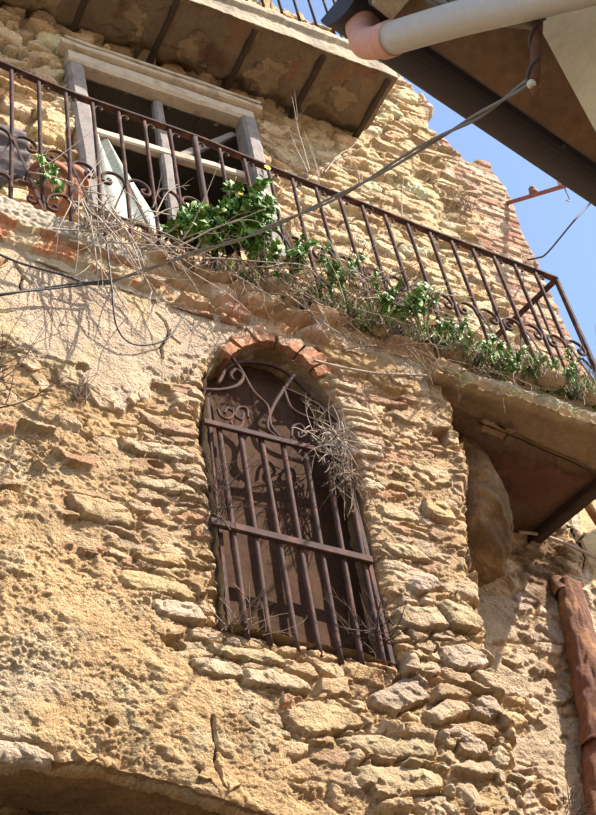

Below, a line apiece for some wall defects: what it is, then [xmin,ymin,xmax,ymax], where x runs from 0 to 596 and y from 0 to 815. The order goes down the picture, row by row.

flaking render [1,353,131,443]
crack [210,718,225,778]